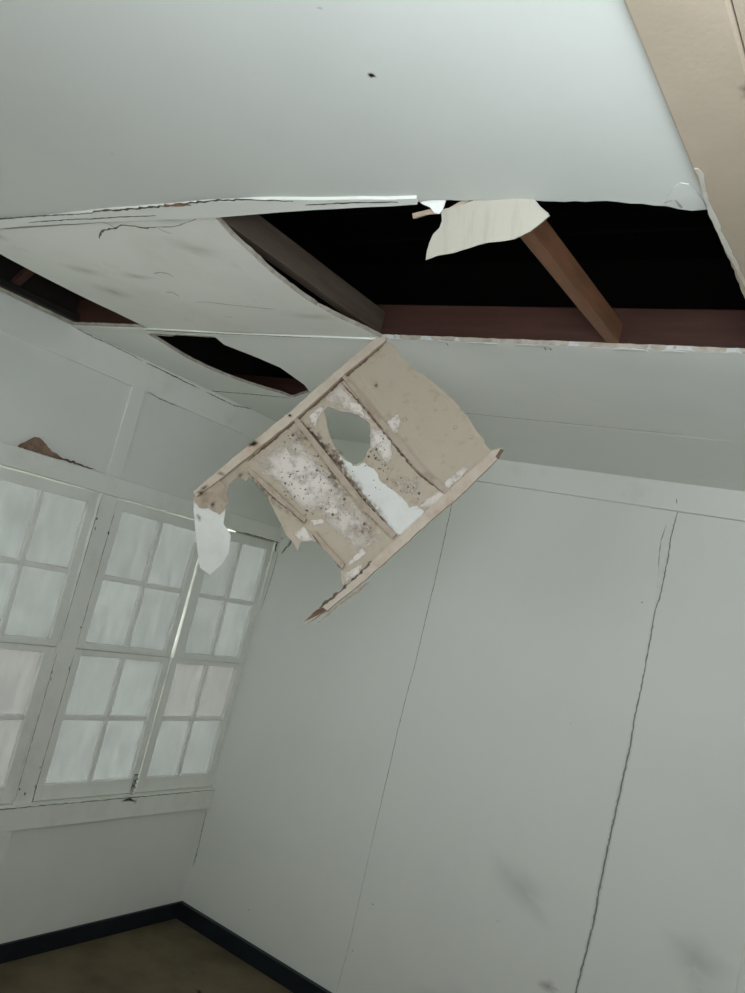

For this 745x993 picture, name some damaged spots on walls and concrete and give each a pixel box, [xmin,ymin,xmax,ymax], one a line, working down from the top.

crack [0,199,398,239]
peeling [420,200,446,214]
peeling [694,168,745,286]
damp [248,347,443,538]
crack [575,498,678,993]